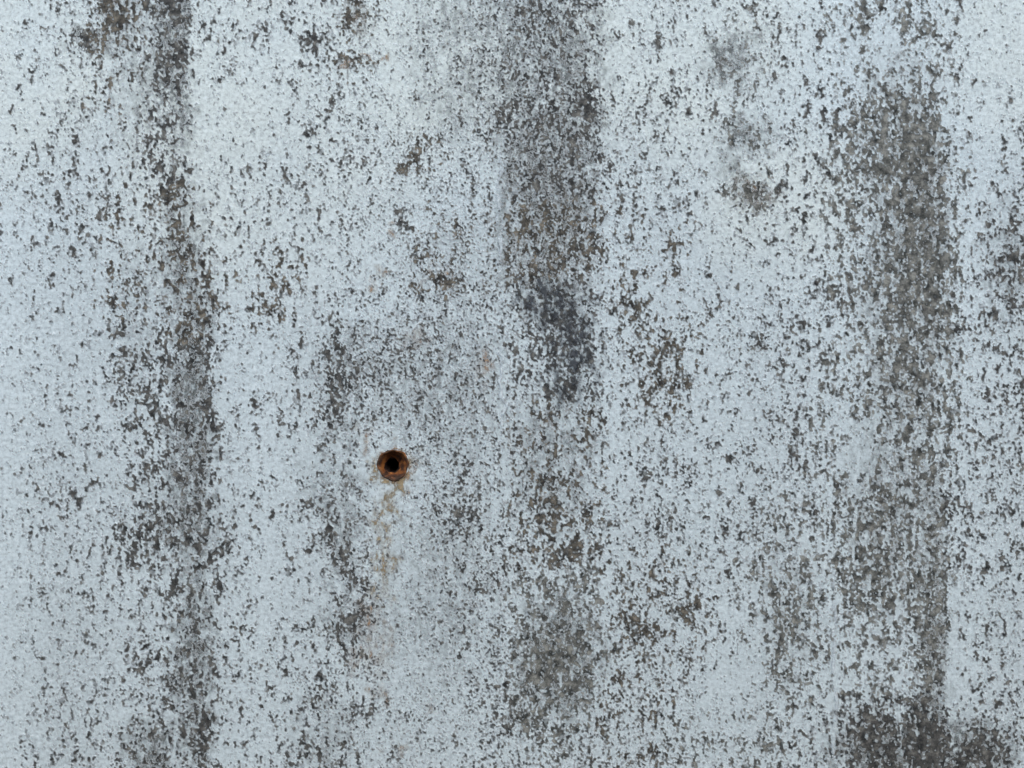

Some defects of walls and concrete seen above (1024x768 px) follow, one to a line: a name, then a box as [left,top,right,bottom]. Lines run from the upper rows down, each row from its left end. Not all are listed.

damp [143,0,192,147]
damp [495,0,607,407]
damp [159,210,218,553]
corrosion [360,448,417,627]
damp [519,593,591,716]
damp [828,531,1015,768]